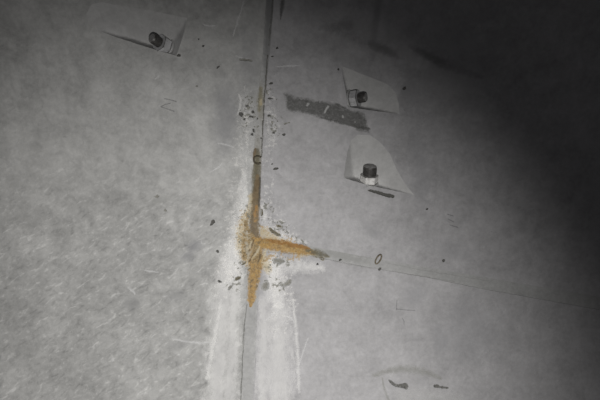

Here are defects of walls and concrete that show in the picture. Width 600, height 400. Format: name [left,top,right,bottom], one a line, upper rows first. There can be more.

damp [234,149,260,240]
rust [236,174,329,307]
damp [208,247,239,400]
damp [259,258,314,400]